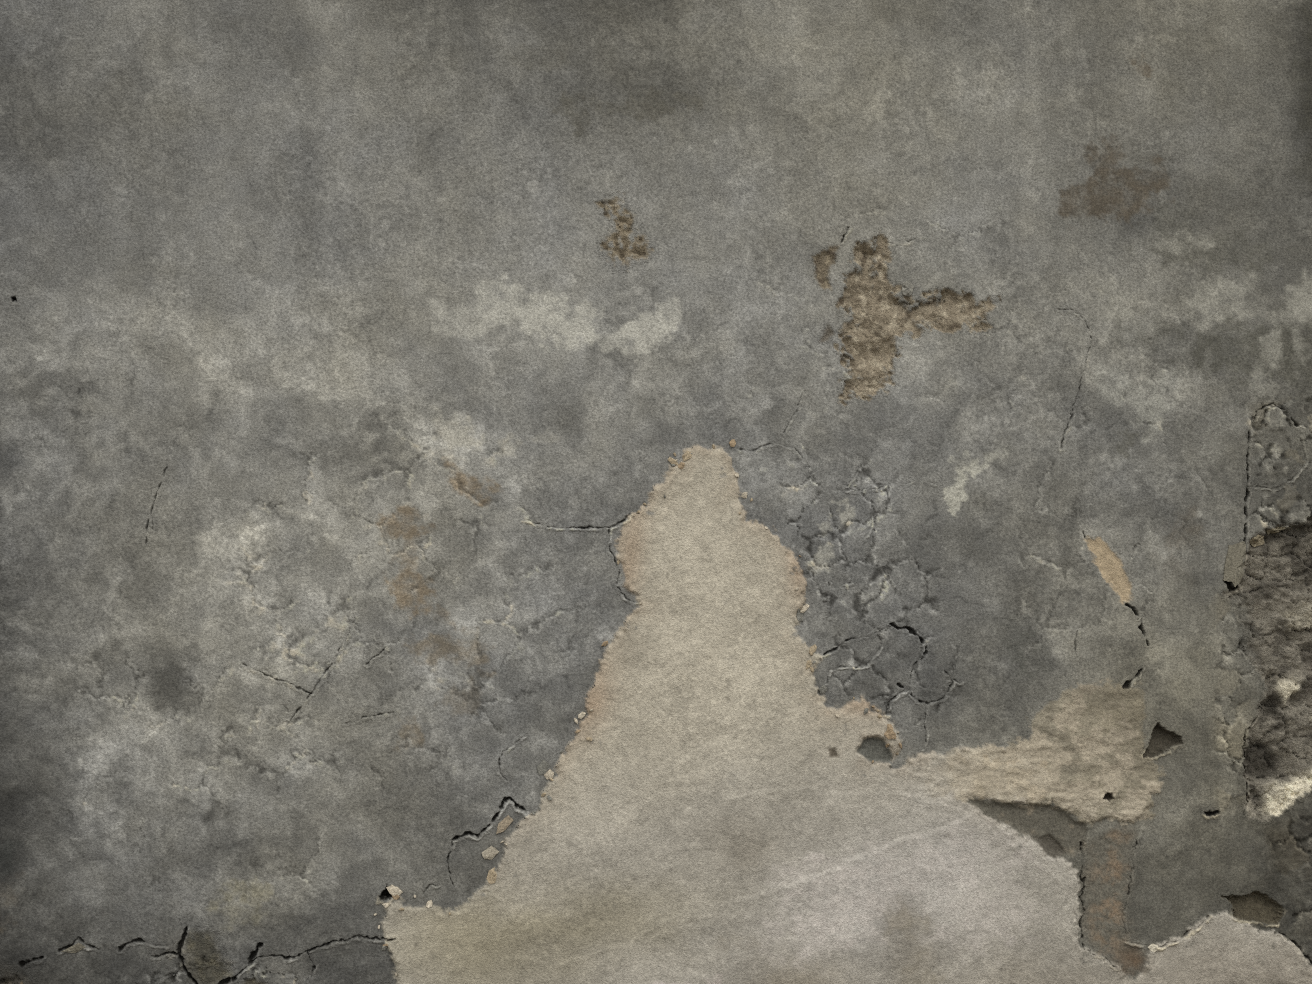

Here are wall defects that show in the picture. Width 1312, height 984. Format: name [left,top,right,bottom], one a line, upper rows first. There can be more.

crack [13,398,642,984]
spalling [591,189,657,273]
peeling [374,439,1312,984]
spalling [811,228,1004,408]
crack [681,162,1311,754]